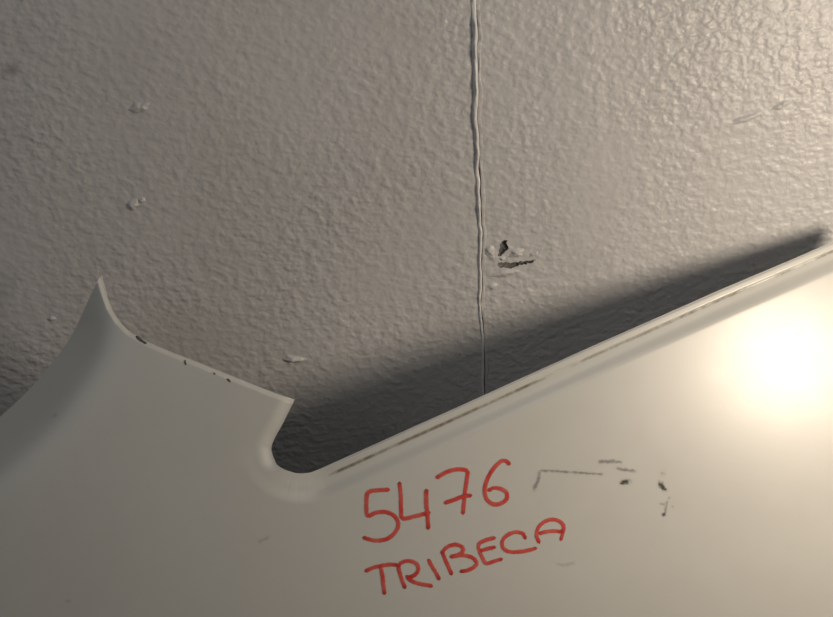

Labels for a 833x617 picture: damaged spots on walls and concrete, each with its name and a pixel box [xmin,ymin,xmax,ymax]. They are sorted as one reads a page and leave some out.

crack [471,0,489,396]
spalling [485,240,538,291]